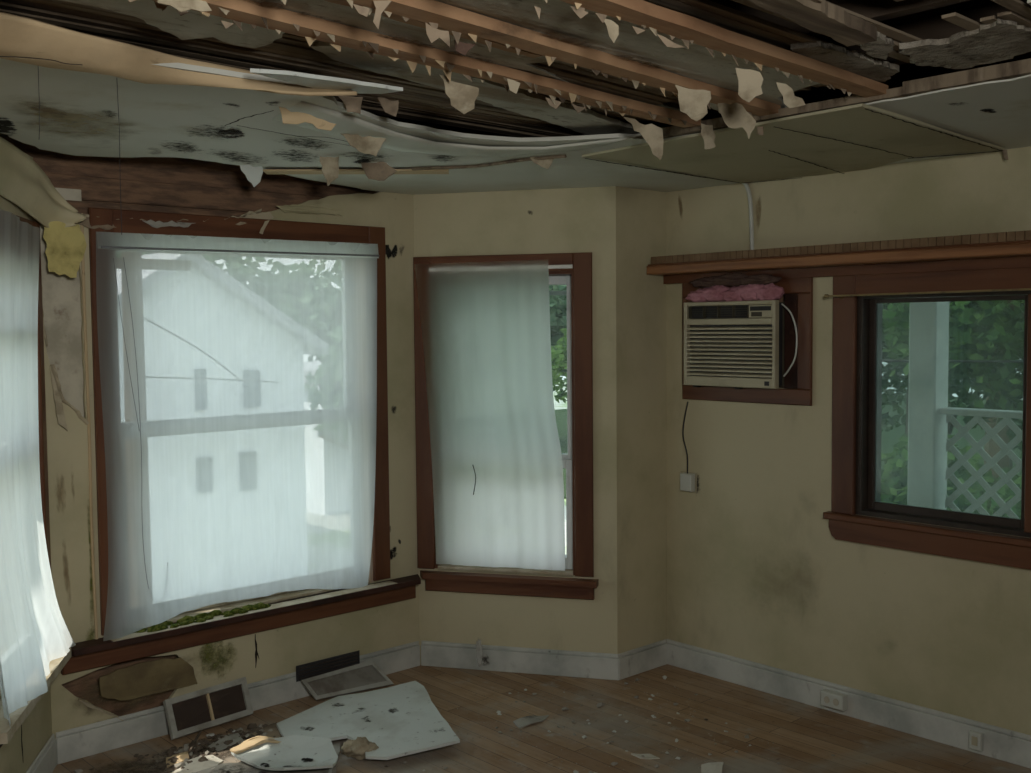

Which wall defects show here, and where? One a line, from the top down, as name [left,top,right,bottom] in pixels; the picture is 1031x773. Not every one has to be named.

flaking render [154,0,281,34]
flaking render [347,0,409,30]
flaking render [571,2,621,43]
flaking render [293,24,341,52]
flaking render [362,22,812,160]
mould [0,118,17,137]
leakage [30,108,123,134]
mould [163,125,244,152]
mould [276,139,327,161]
flaking render [279,107,397,181]
mould [346,152,382,164]
spalling [40,223,98,639]